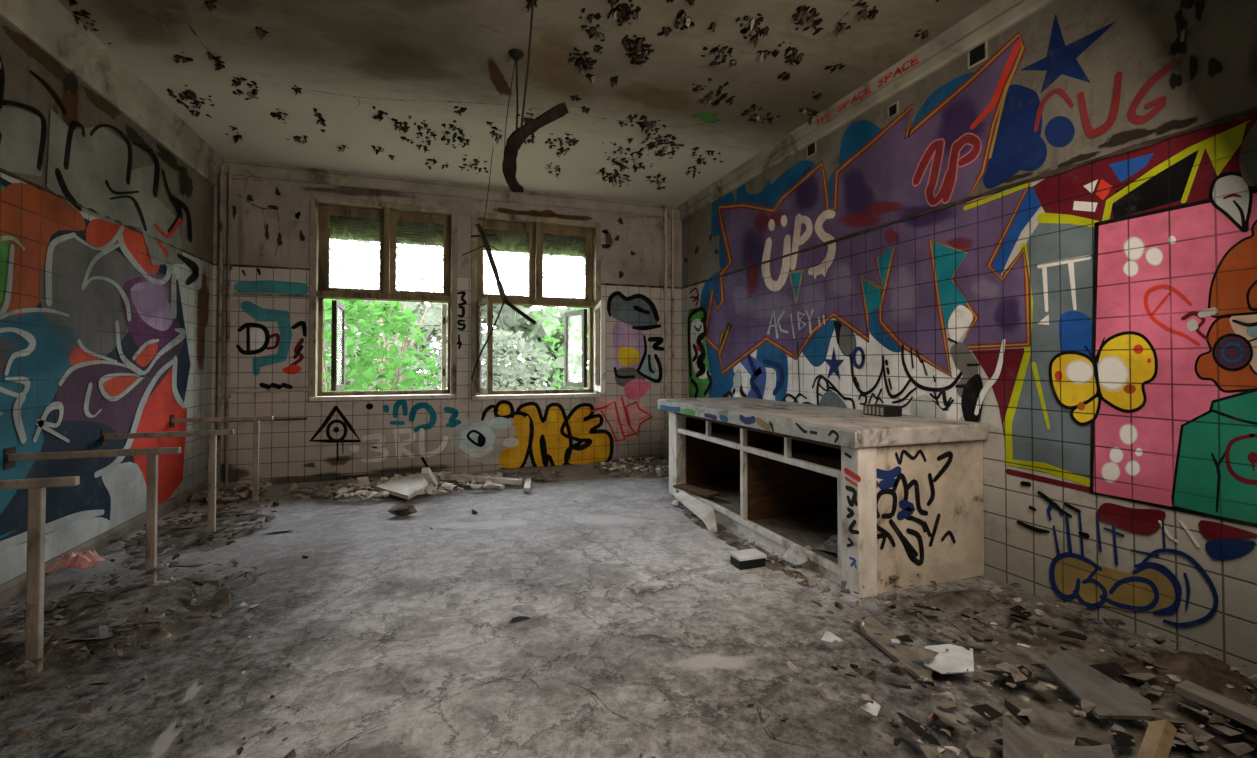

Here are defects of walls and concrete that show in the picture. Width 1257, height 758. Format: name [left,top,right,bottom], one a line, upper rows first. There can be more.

peeling [69,0,99,31]
peeling [3,26,193,198]
peeling [166,84,215,118]
peeling [207,52,259,100]
peeling [270,108,326,145]
peeling [372,106,488,174]
peeling [486,121,502,144]
peeling [518,109,579,177]
peeling [596,114,724,190]
peeling [568,0,781,125]
peeling [736,0,879,81]